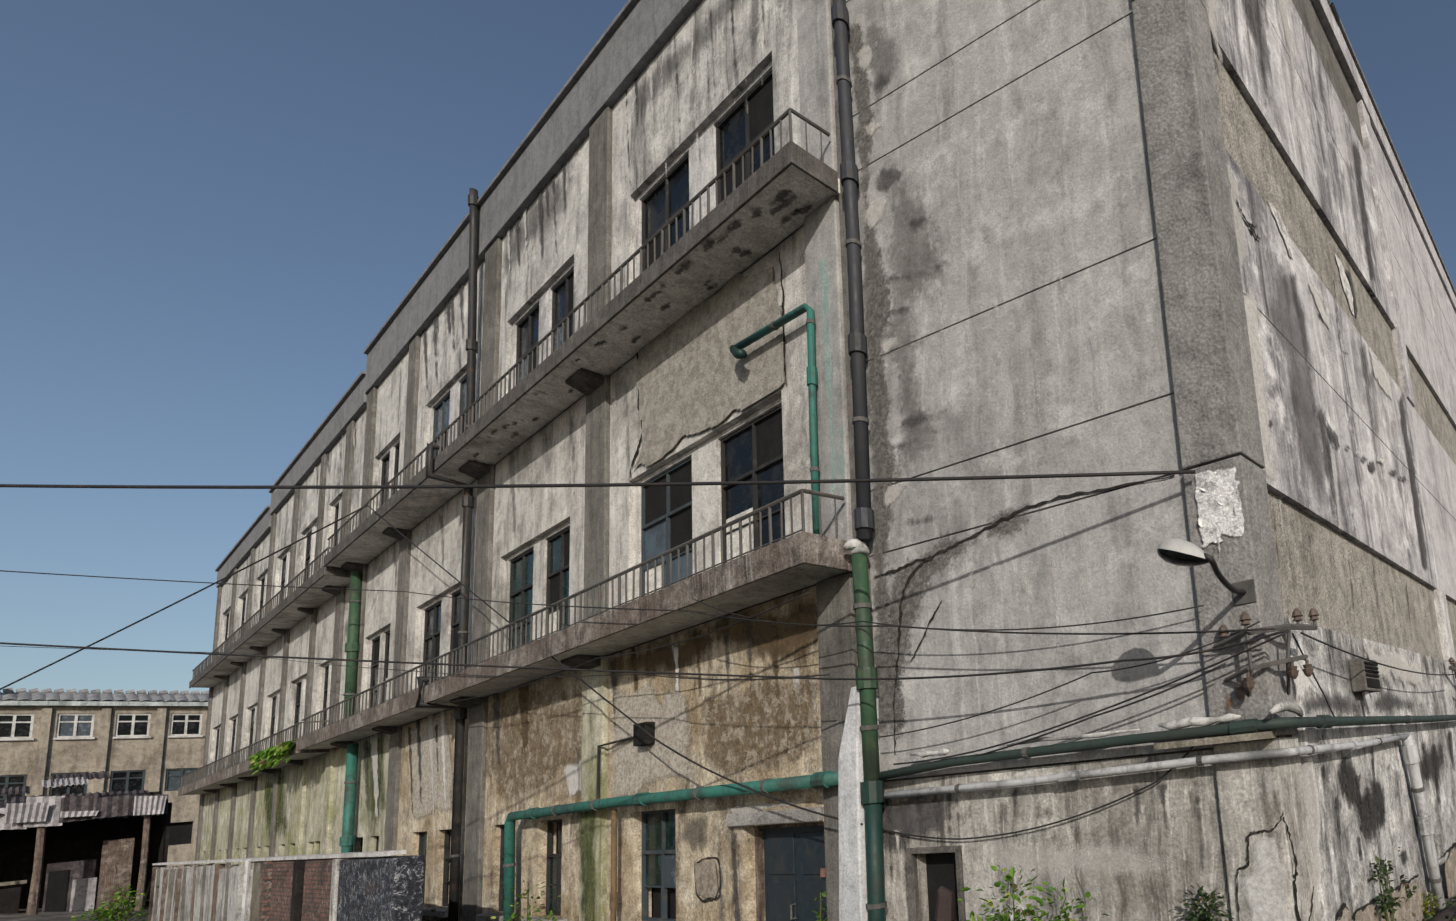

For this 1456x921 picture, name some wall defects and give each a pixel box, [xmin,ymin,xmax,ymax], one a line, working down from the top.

water stain [1245,0,1270,84]
water stain [1228,169,1245,263]
water stain [1353,144,1375,279]
peeling [1335,254,1358,317]
water stain [1244,294,1275,479]
peeling [1195,466,1245,548]
water stain [1399,396,1427,569]
water stain [608,602,818,727]
crack [874,474,1175,755]
water stain [1290,638,1422,712]
crack [1236,811,1314,921]
water stain [1302,746,1394,892]